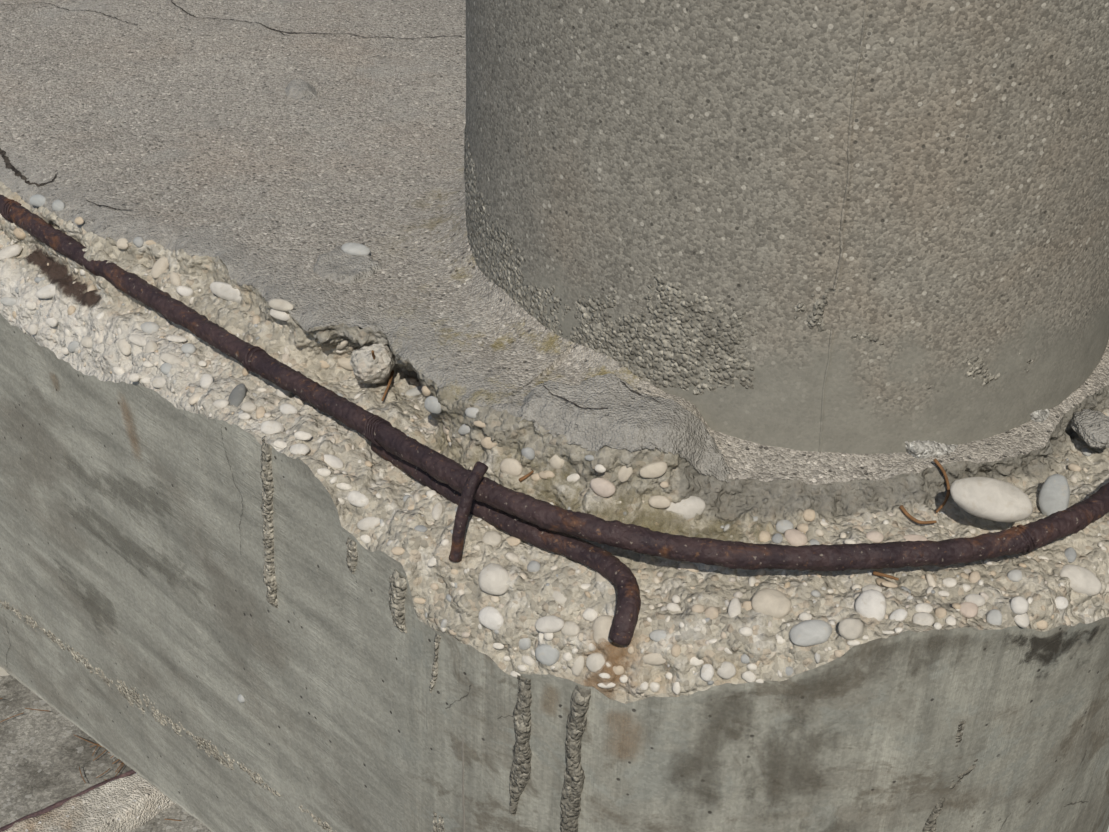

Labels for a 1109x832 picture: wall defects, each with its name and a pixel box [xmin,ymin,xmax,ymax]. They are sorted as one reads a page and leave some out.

crack [0,148,58,186]
spalling [0,182,1109,704]